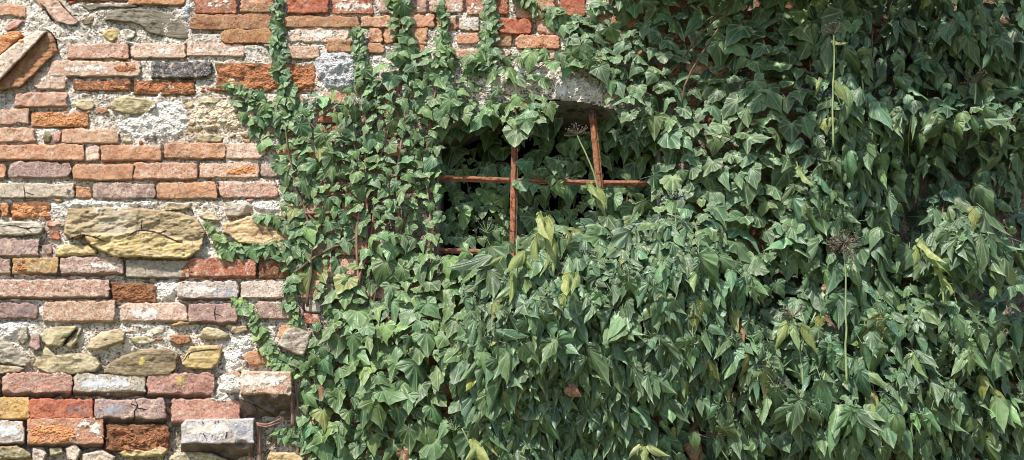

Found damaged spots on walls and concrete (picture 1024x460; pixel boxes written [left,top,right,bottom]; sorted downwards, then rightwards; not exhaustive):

corrosion [590,118,646,185]
corrosion [440,176,516,231]
crack [64,222,182,243]